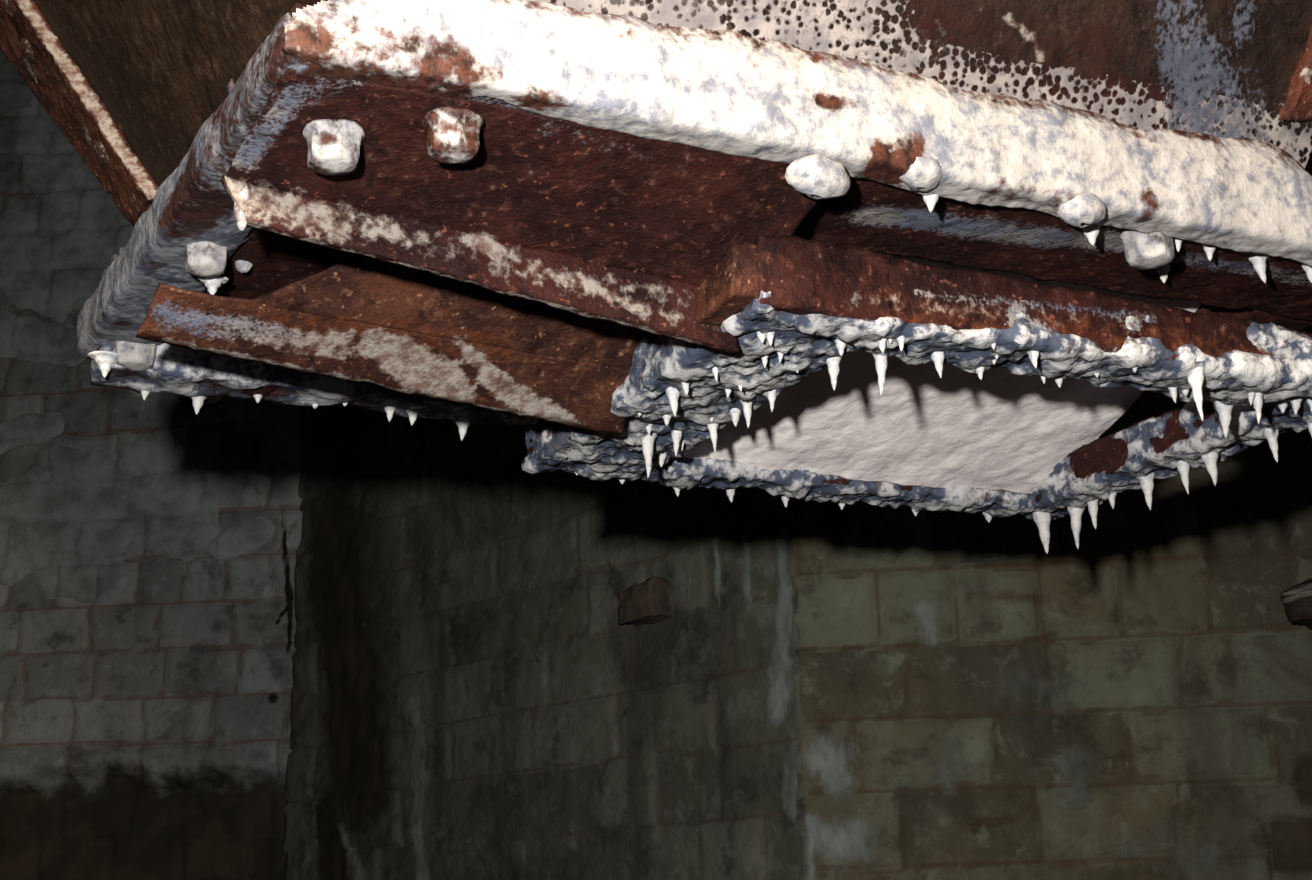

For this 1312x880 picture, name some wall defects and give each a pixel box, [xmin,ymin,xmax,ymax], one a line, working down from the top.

corrosion [891,2,1172,130]
leakage [76,0,1312,425]
crack [276,529,294,652]
leakage [767,528,793,724]
leakage [0,745,287,880]